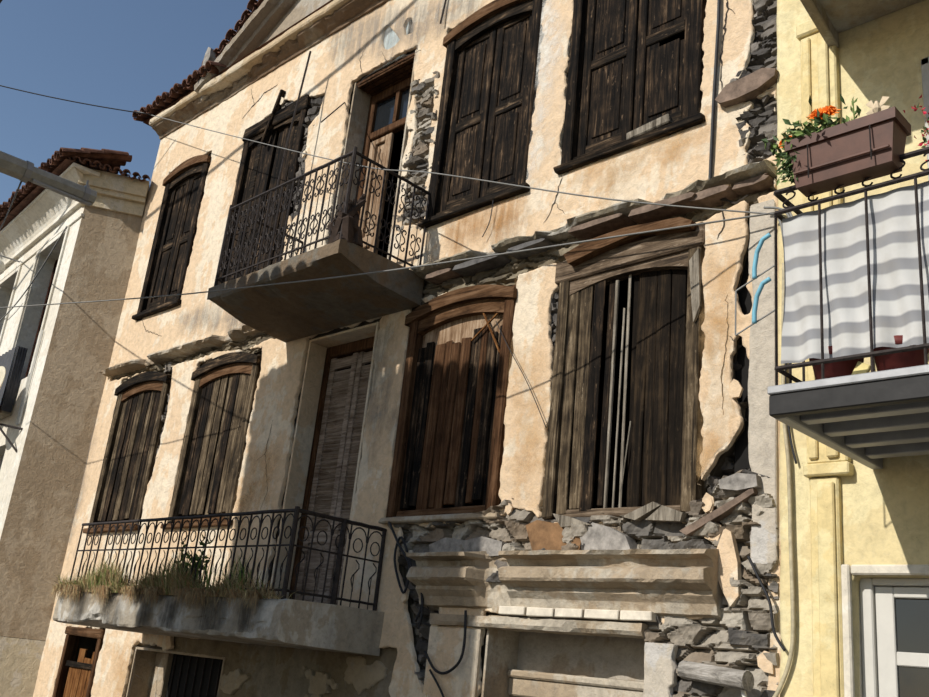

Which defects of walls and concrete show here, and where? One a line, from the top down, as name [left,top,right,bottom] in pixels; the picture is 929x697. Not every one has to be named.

spalling [718,0,777,95]
spalling [736,82,778,164]
spalling [288,96,324,229]
spalling [663,178,777,223]
spalling [418,237,592,307]
crack [720,294,749,422]
crack [706,448,750,495]
flaking render [702,493,722,541]
spalling [397,527,440,683]
flaking render [171,636,397,697]
flaking render [757,651,774,674]